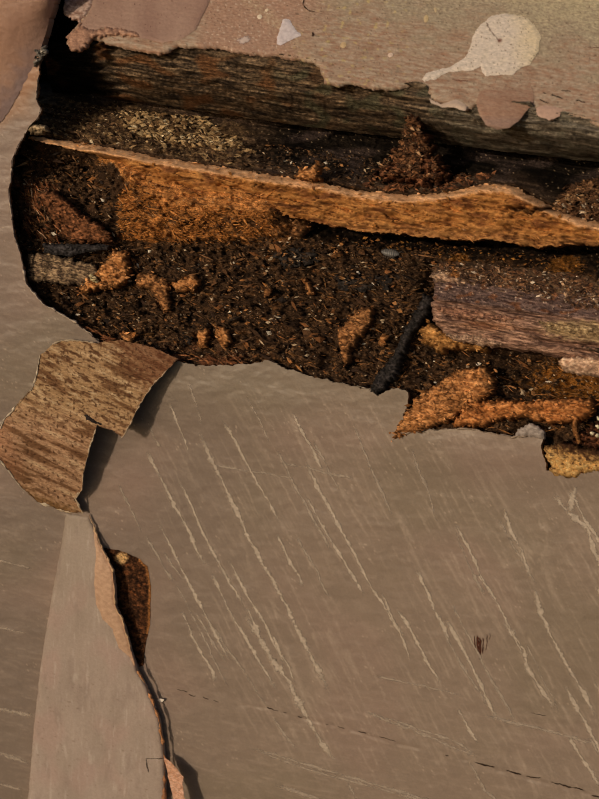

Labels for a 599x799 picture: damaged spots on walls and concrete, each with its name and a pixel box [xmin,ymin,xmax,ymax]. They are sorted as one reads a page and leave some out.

peeling [48,0,139,52]
spalling [10,45,599,389]
spalling [377,309,599,471]
peeling [0,339,185,799]
crack [475,762,599,797]